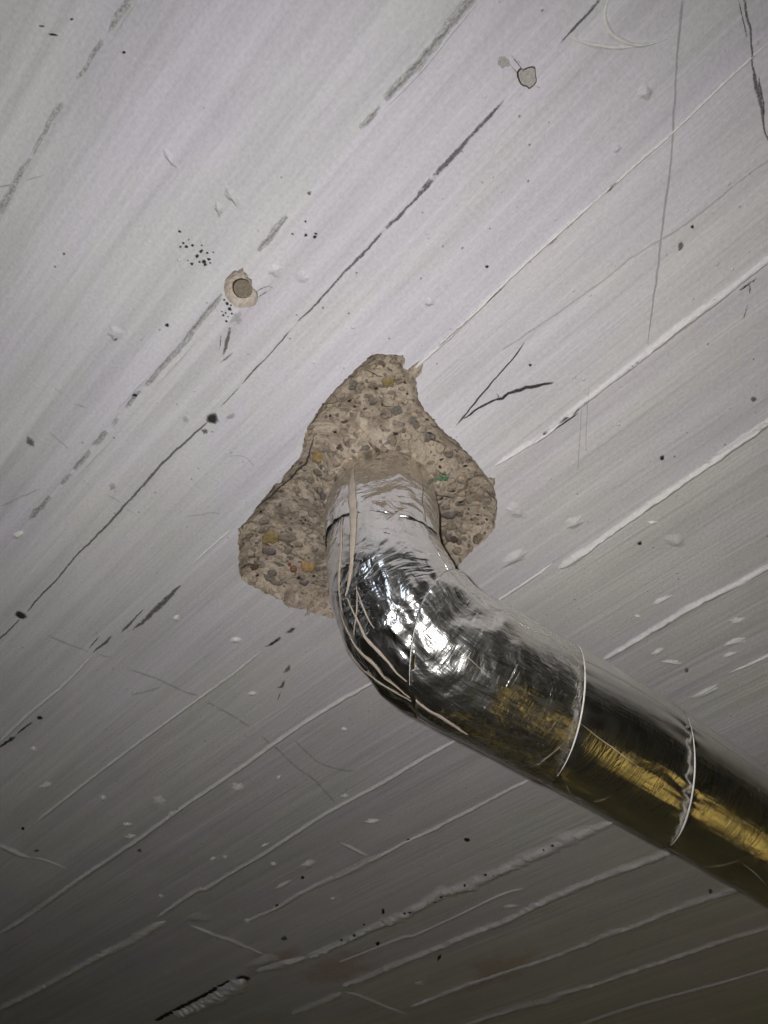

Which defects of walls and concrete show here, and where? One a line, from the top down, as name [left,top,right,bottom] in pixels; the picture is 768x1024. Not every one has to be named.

crack [223,106,499,404]
crack [499,0,768,368]
crack [0,423,206,639]
spalling [237,354,497,618]